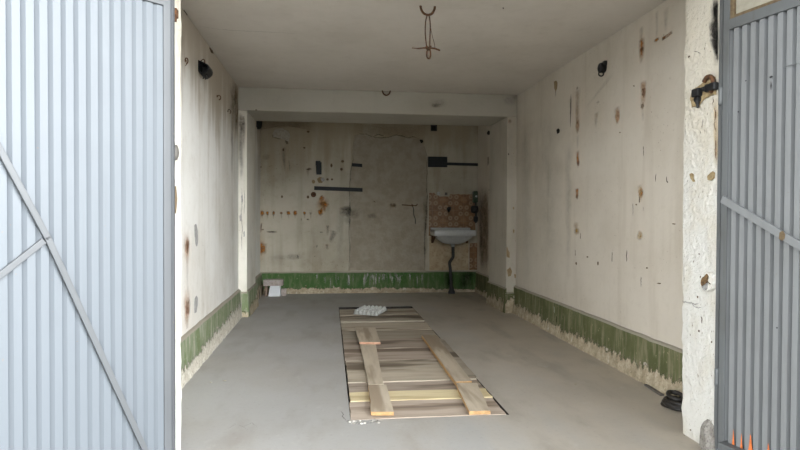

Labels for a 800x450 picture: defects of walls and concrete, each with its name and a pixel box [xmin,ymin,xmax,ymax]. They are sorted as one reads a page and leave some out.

spalling [181,283,269,389]
spalling [287,285,683,397]
spalling [697,272,716,298]